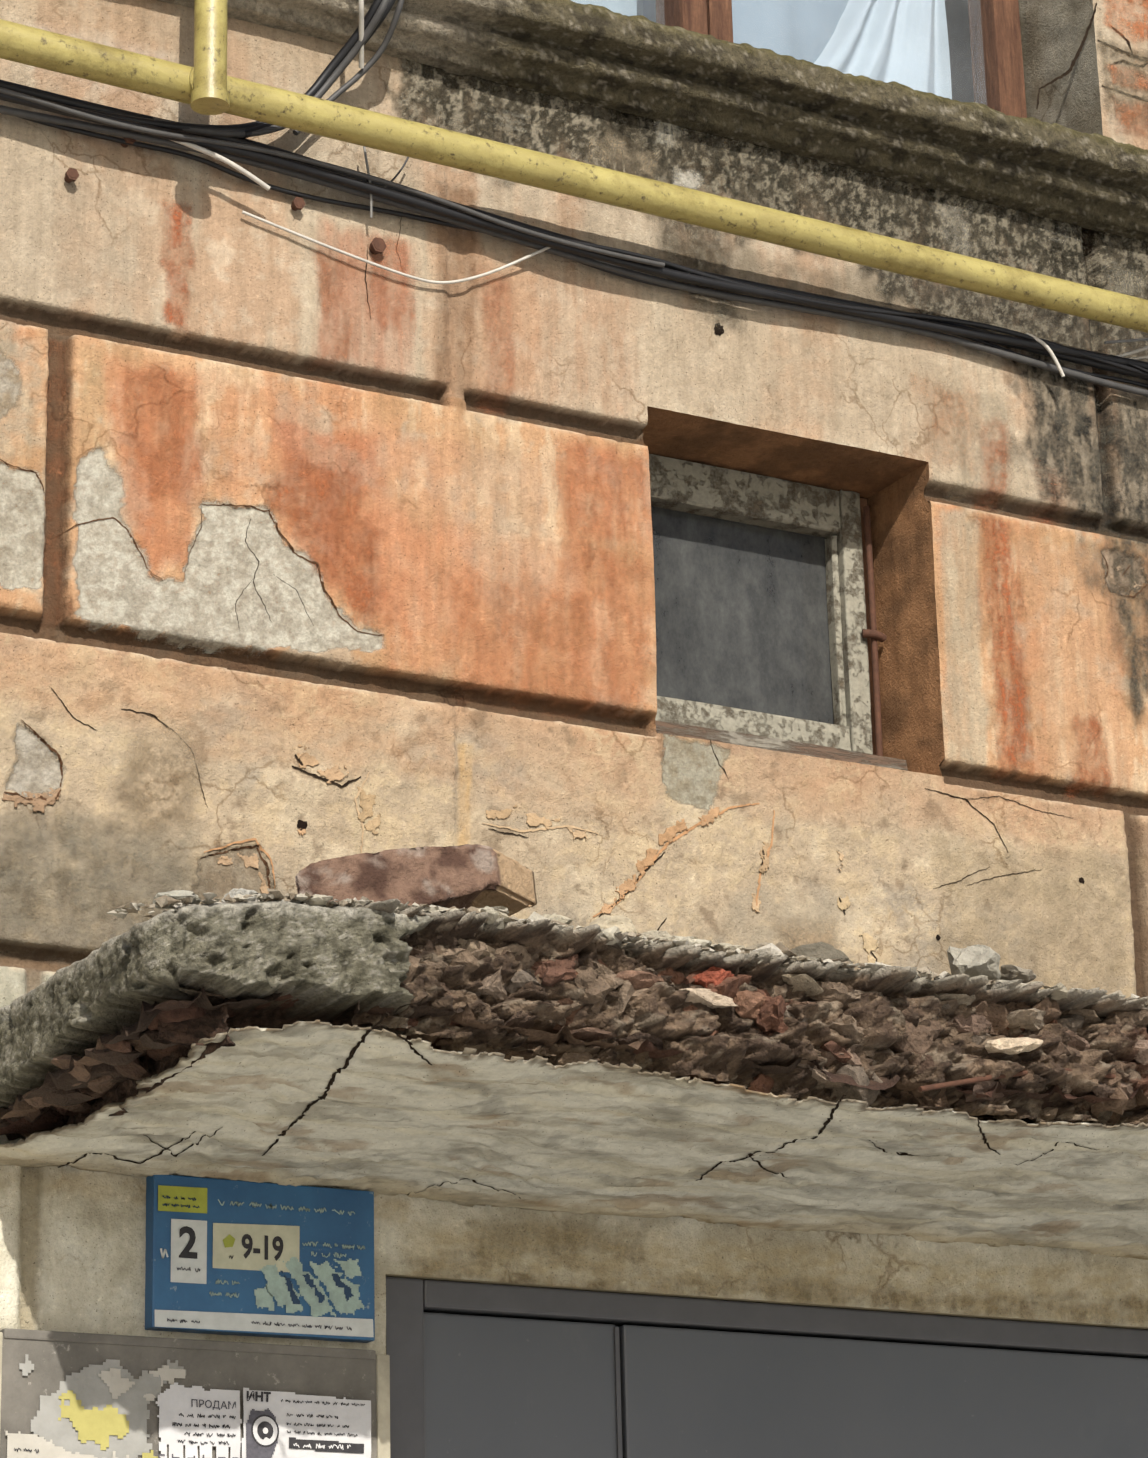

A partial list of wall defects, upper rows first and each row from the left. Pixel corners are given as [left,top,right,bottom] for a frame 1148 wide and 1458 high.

crack [1036,3,1148,110]
damp [387,58,1148,300]
damp [659,217,744,323]
peeling [0,448,383,654]
damp [862,266,1148,715]
rust [981,494,1026,773]
peeling [2,720,64,813]
spalling [192,838,276,904]
spalling [292,734,1148,1126]
crack [925,788,1071,889]
crack [262,996,432,1156]
crack [696,1094,846,1181]